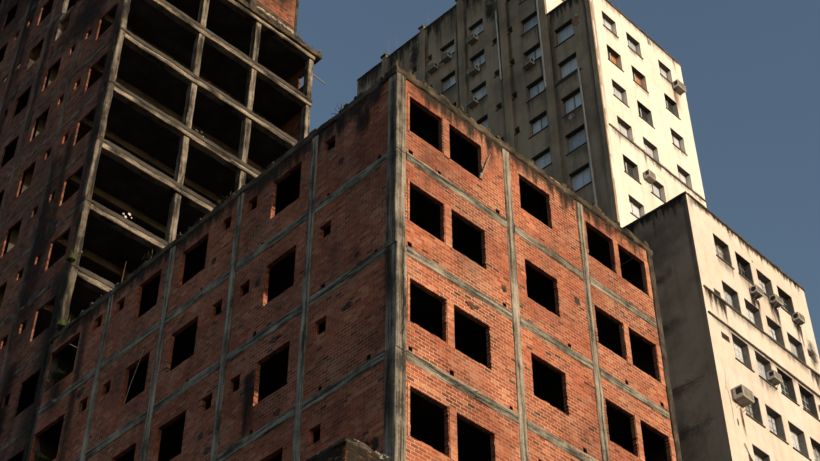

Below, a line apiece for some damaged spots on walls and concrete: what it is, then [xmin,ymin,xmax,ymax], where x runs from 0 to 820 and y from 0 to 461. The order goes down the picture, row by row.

damp [705,288,735,314]